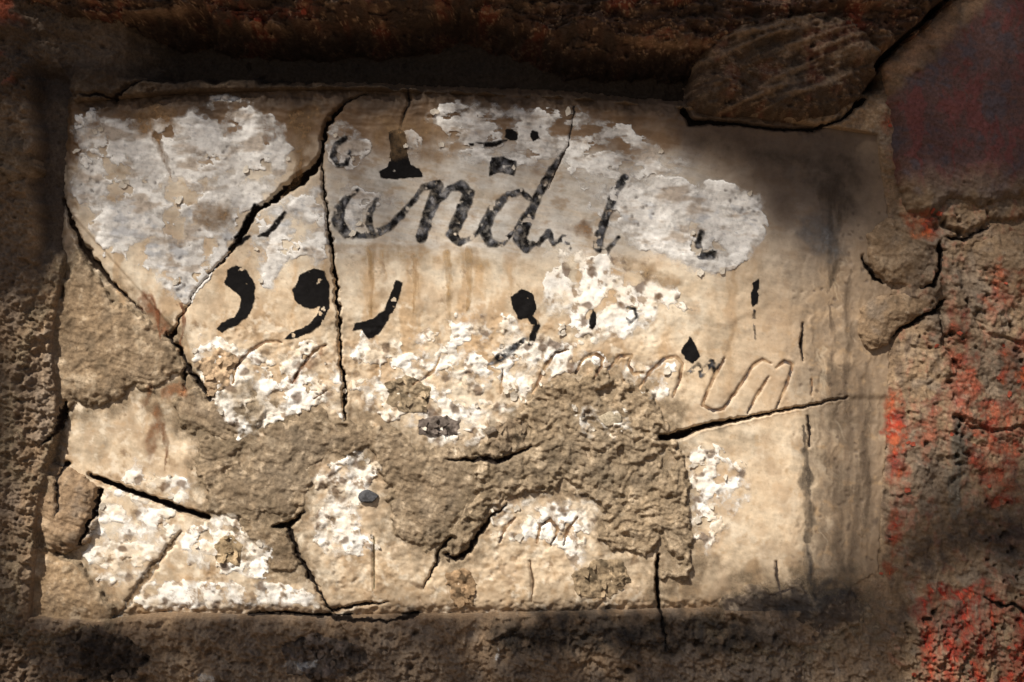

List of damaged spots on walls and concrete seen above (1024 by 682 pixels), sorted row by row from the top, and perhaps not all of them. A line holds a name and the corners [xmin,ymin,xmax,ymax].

crack [401,88,411,128]
peeling [70,95,329,304]
peeling [430,100,769,277]
crack [166,94,366,420]
crack [797,323,805,361]
crack [39,401,69,446]
crack [658,397,847,447]
crack [54,461,211,618]
peeling [312,452,381,556]
spalling [445,568,477,609]
peeling [490,499,632,599]
crack [655,553,667,637]